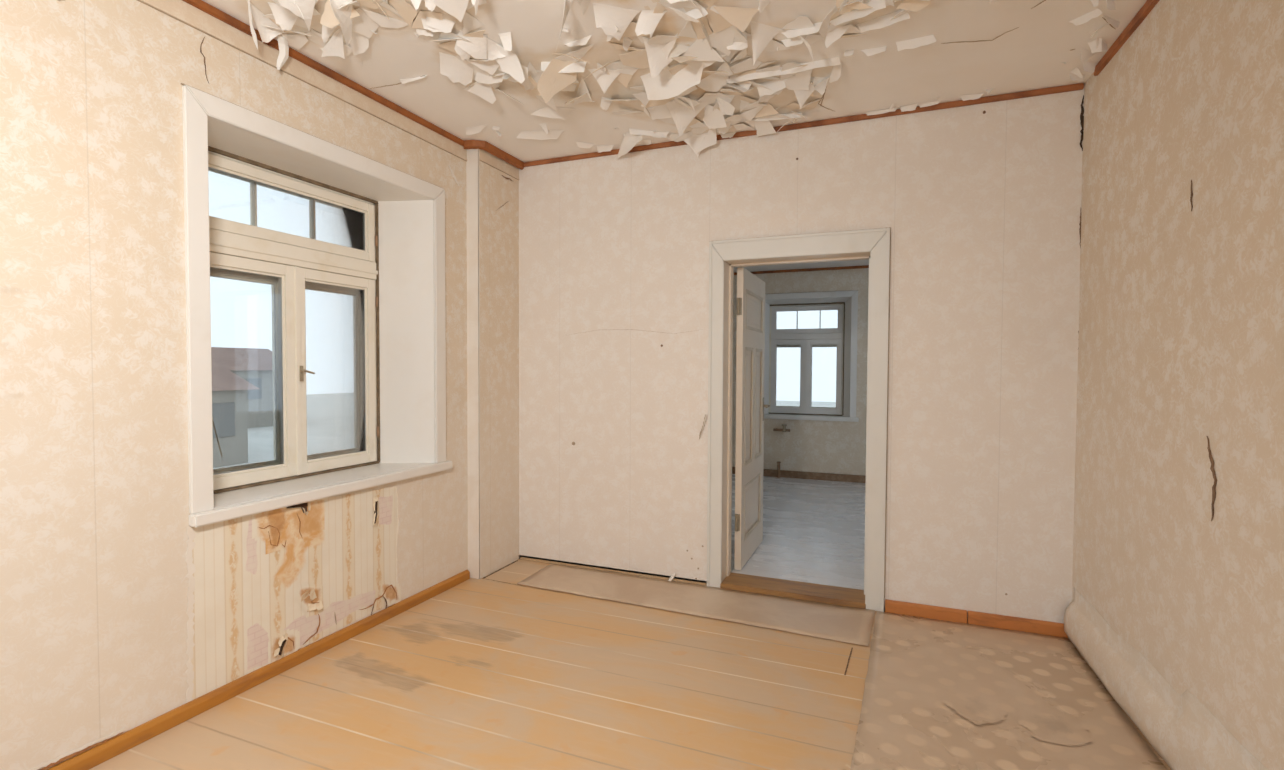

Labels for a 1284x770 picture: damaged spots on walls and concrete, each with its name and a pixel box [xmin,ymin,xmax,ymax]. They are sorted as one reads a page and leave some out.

peeling [219,0,950,159]
peeling [959,88,995,101]
spalling [283,501,311,515]
spalling [298,583,326,618]
spalling [273,633,288,660]